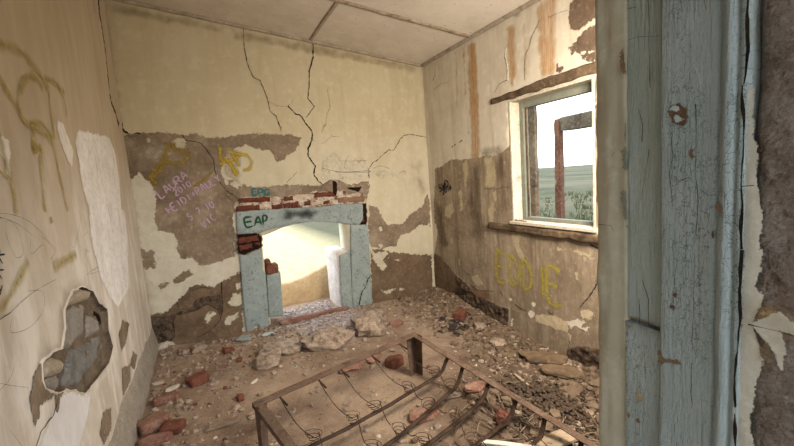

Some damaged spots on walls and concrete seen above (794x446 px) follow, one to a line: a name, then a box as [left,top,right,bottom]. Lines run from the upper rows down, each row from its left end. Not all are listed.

corrosion [539,7,553,75]
peeling [568,0,596,63]
crack [243,29,330,193]
corrosion [469,44,478,158]
peeling [123,132,600,373]
spalling [30,285,137,446]
spalling [464,381,485,394]